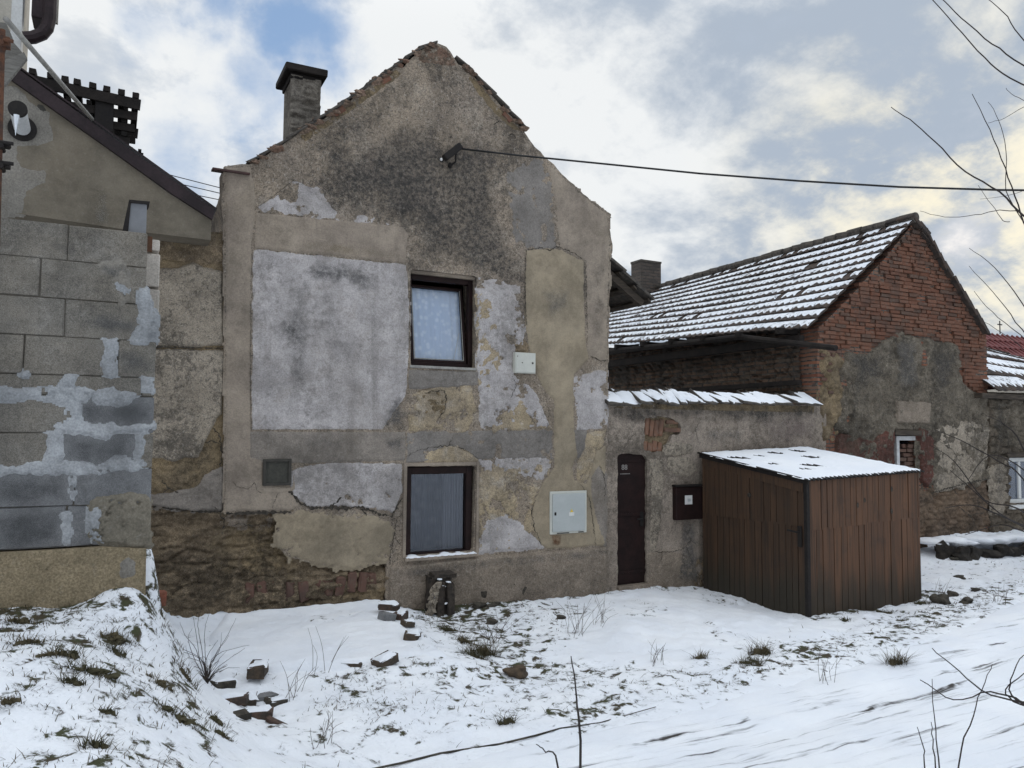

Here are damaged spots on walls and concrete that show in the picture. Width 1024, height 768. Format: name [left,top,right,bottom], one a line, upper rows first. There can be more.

peeling [259,181,340,221]
peeling [354,215,389,225]
peeling [408,277,552,433]
peeling [816,331,1024,516]
peeling [151,461,223,513]
peeling [478,457,551,555]
peeling [644,416,697,552]